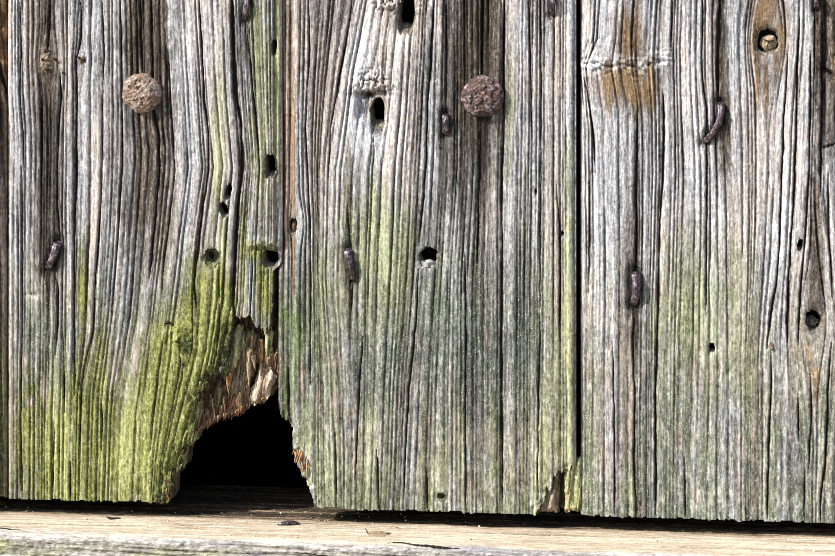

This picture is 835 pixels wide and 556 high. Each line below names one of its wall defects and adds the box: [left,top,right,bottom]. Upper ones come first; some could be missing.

corrosion [43,0,51,31]
corrosion [36,70,62,293]
corrosion [113,0,176,256]
corrosion [341,147,353,314]
corrosion [440,0,508,204]
corrosion [620,172,640,367]
corrosion [715,0,731,177]
corrosion [814,0,835,154]
spalling [160,312,278,504]
spalling [537,454,582,513]
corrosion [622,376,633,456]